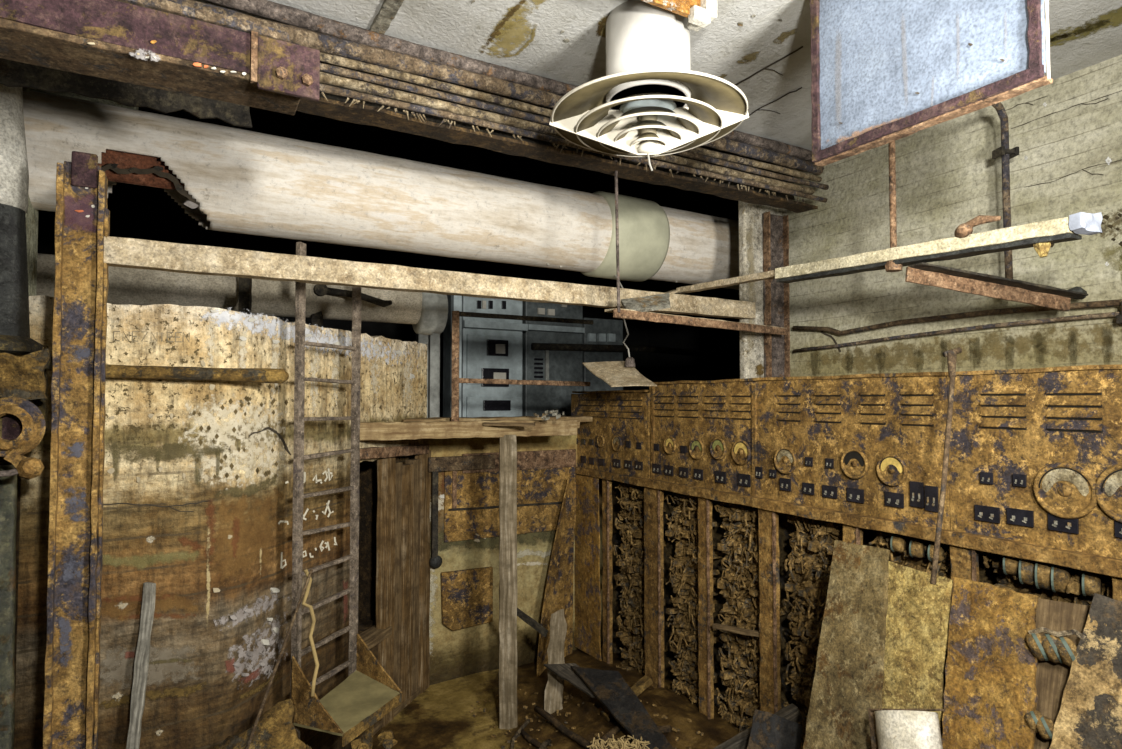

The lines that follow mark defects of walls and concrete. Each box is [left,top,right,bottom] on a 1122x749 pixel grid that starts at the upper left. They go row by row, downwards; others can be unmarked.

damp [481,0,545,58]
damp [1045,7,1122,47]
corrosion [64,187,97,232]
damp [811,322,1121,375]
corrosion [61,442,84,458]
damp [111,443,224,484]
corrosion [65,487,89,522]
corrosion [59,618,73,666]